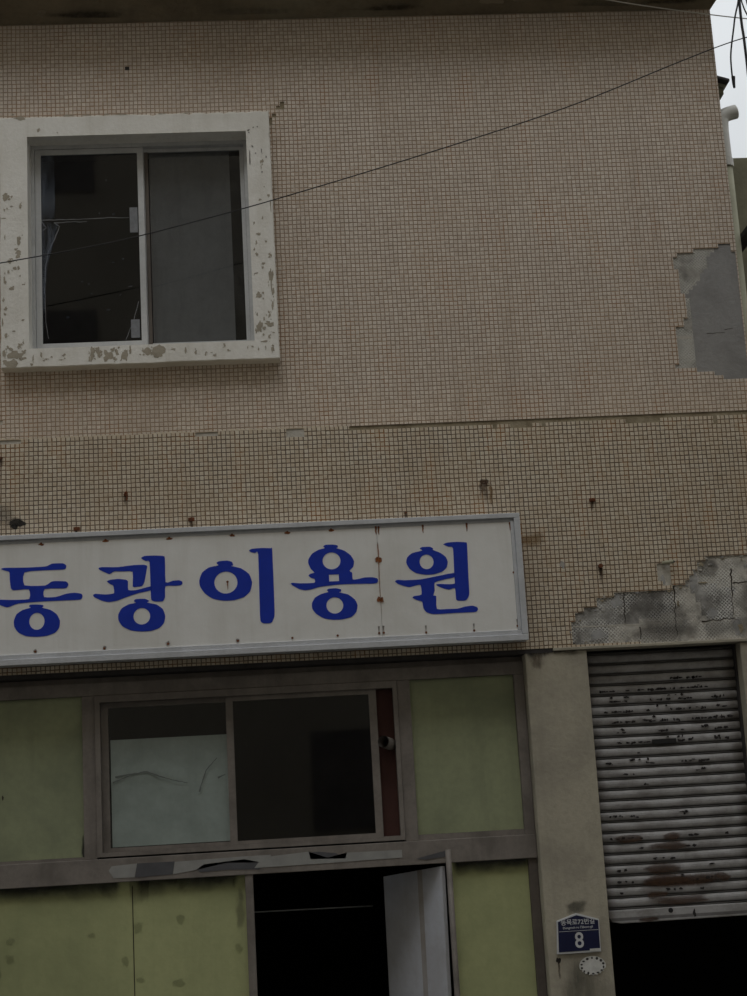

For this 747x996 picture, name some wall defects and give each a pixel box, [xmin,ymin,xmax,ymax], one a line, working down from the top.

peeling [2,235,66,367]
peeling [89,343,231,362]
spalling [570,555,747,645]
corrosion [644,864,731,904]